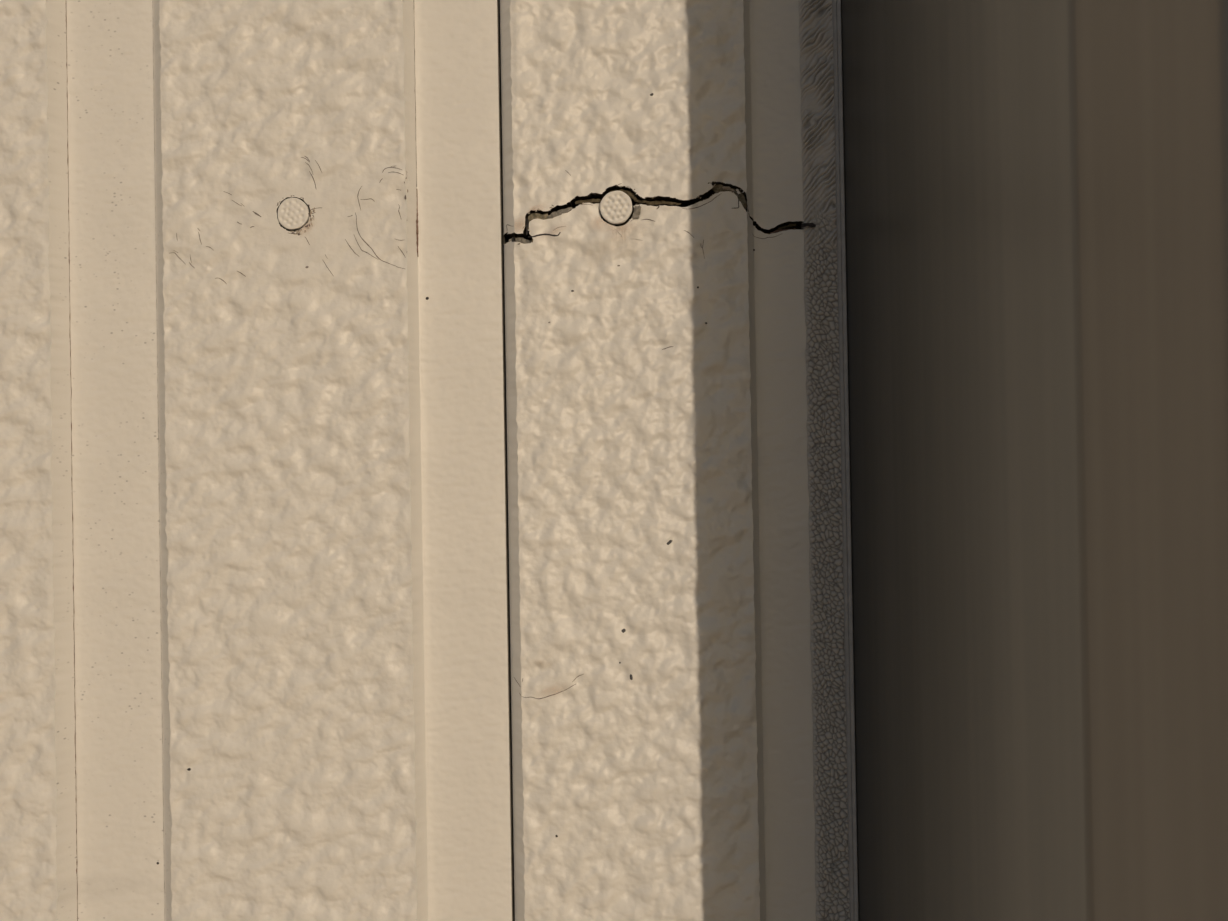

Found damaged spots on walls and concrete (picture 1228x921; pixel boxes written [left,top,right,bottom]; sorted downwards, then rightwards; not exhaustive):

crack [503,170,850,921]